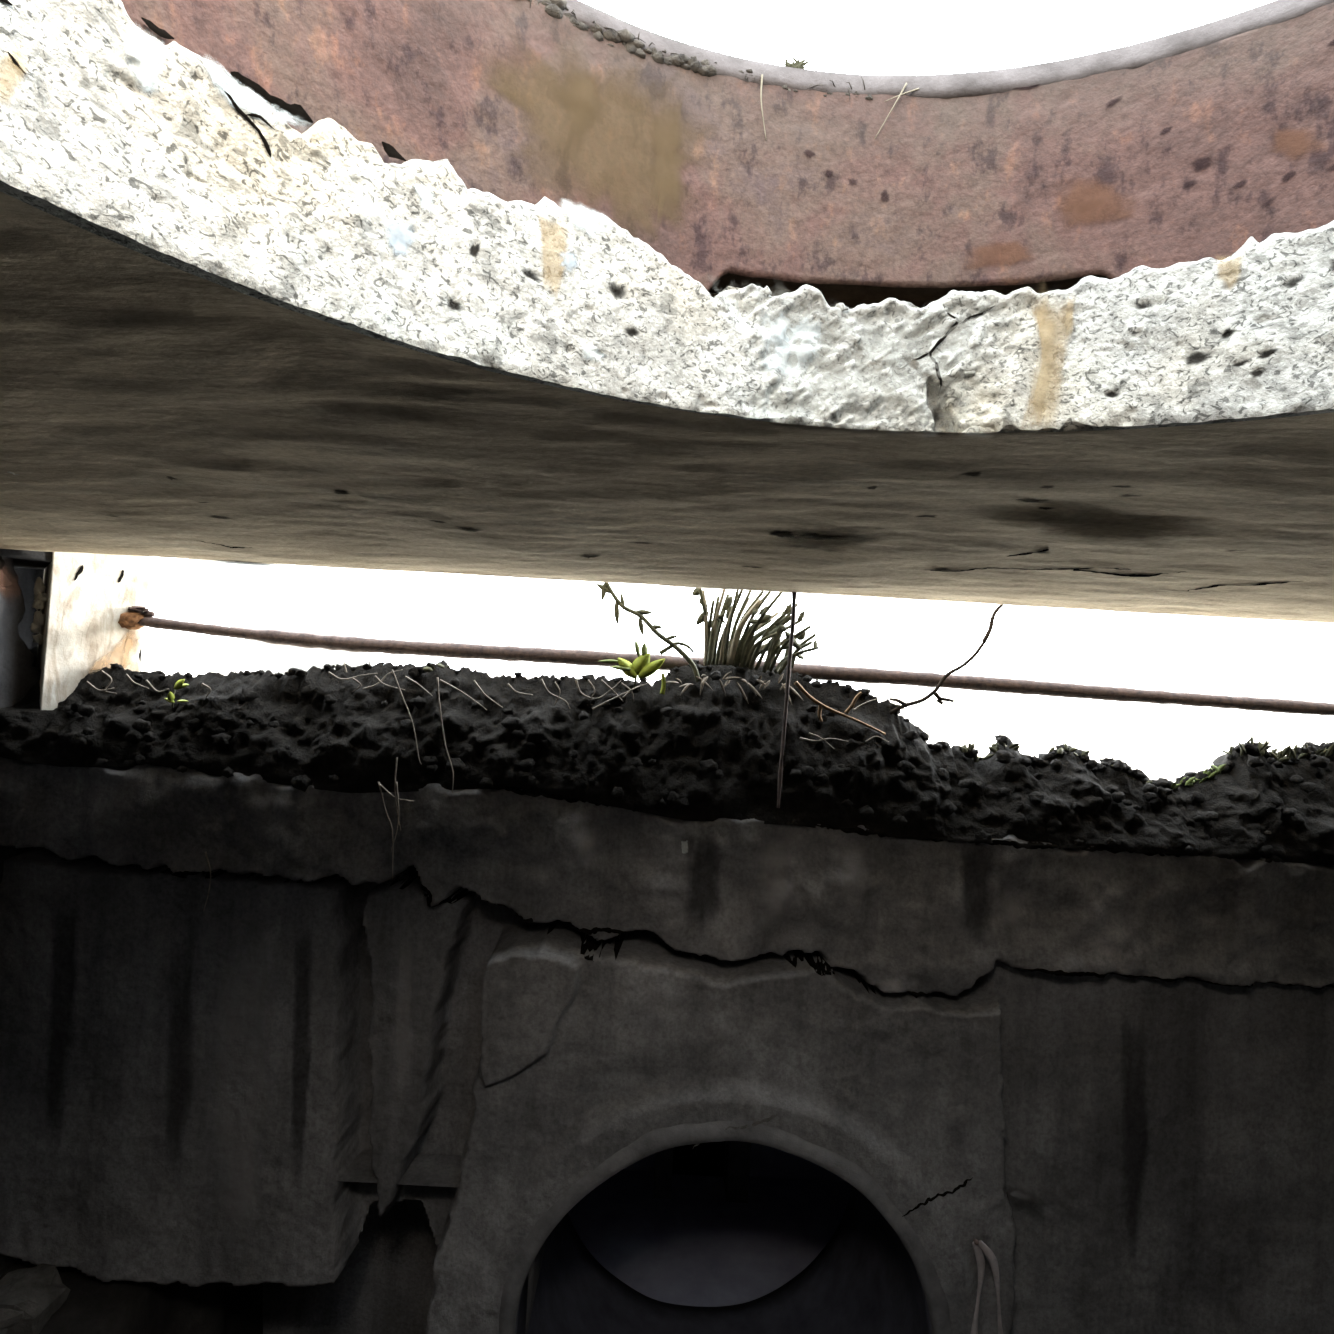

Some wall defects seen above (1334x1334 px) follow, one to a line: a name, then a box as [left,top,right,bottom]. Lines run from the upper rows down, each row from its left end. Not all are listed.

peeling [125,29,163,92]
peeling [205,60,295,122]
corrosion [1184,156,1211,188]
peeling [415,185,433,210]
peeling [562,200,609,235]
spalling [611,284,624,298]
peeling [758,314,821,374]
crack [900,306,994,396]
spalling [1187,352,1208,364]
spalling [1233,349,1277,377]
crack [930,549,1304,591]
crack [902,1177,973,1217]